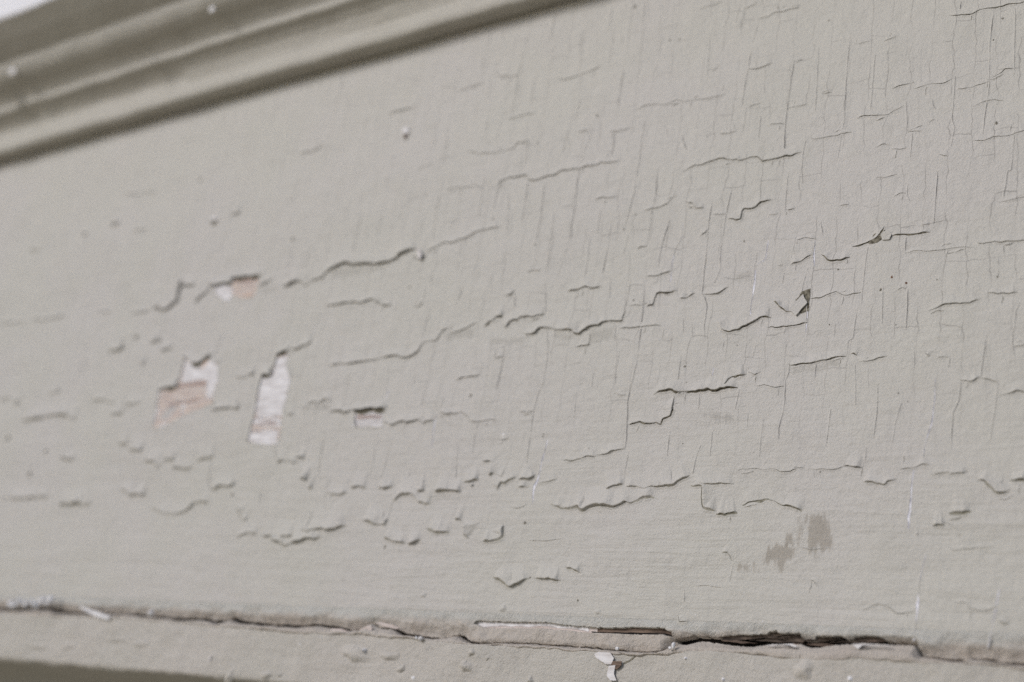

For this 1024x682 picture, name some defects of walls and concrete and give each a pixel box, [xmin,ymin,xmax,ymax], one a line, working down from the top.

peeling [208,266,265,303]
crack [107,0,1024,590]
peeling [152,345,223,431]
peeling [245,341,293,448]
peeling [353,399,389,430]
crack [0,608,481,644]
crack [862,555,926,641]
crack [934,658,1024,666]